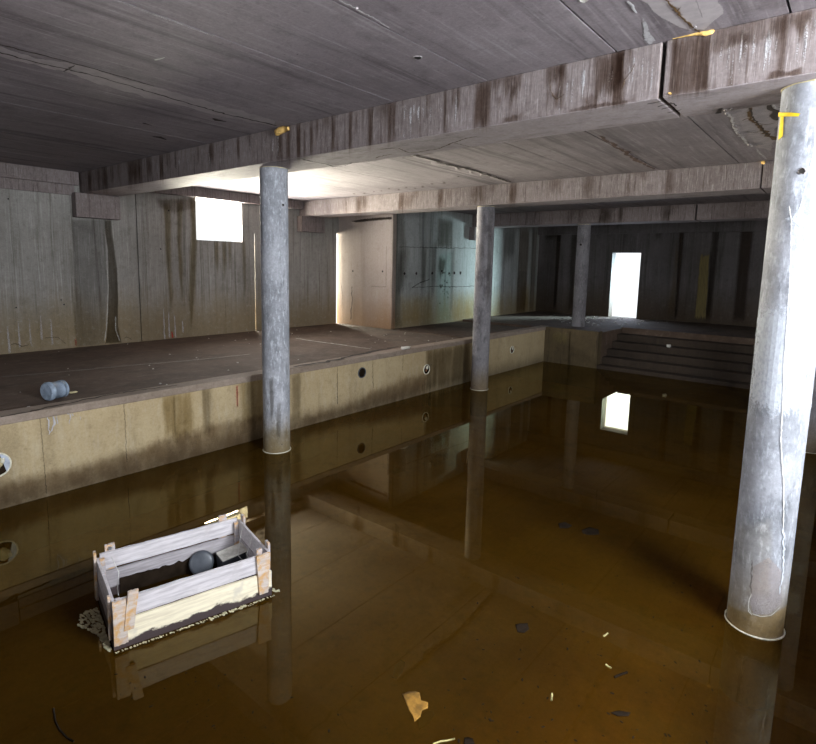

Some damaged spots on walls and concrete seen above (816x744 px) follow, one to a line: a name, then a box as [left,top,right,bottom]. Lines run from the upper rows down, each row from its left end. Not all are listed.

leakage [627,1,655,44]
flaking render [643,0,724,30]
leakage [763,30,778,70]
crack [0,52,277,126]
flaking render [716,104,780,159]
leakage [105,221,121,342]
crack [779,132,816,594]